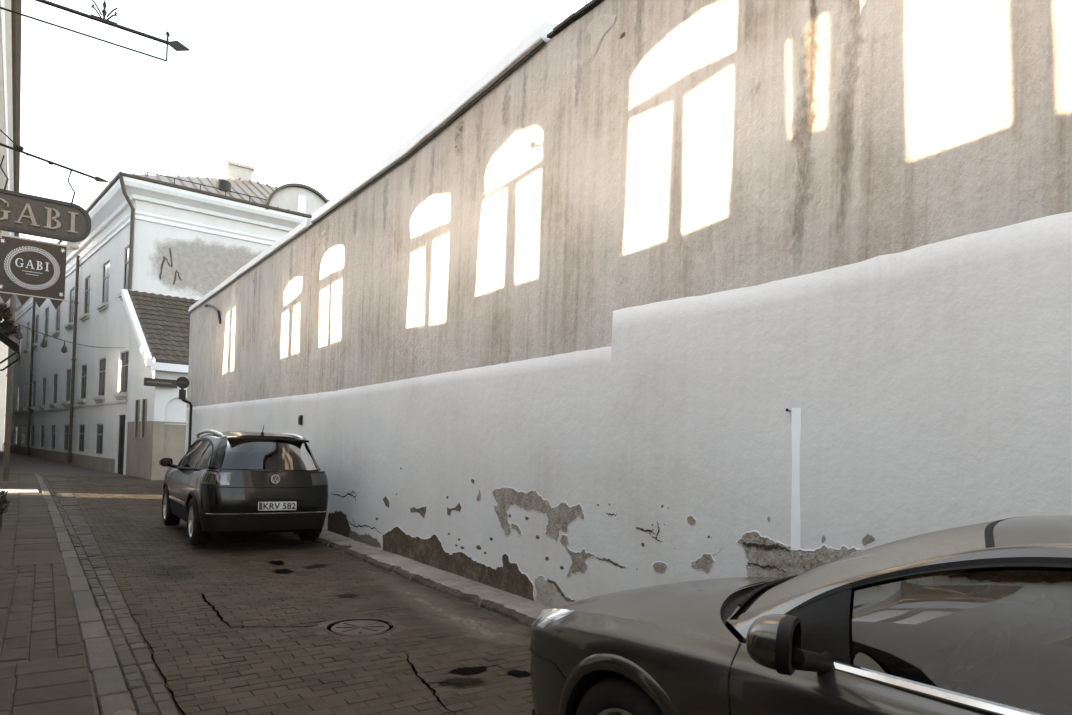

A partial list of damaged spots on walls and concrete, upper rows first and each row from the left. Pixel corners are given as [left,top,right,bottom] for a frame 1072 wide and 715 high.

damp [794,0,817,198]
peeling [382,478,638,607]
peeling [652,561,668,574]
peeling [691,553,716,575]
spalling [736,517,875,578]
crack [406,654,456,715]